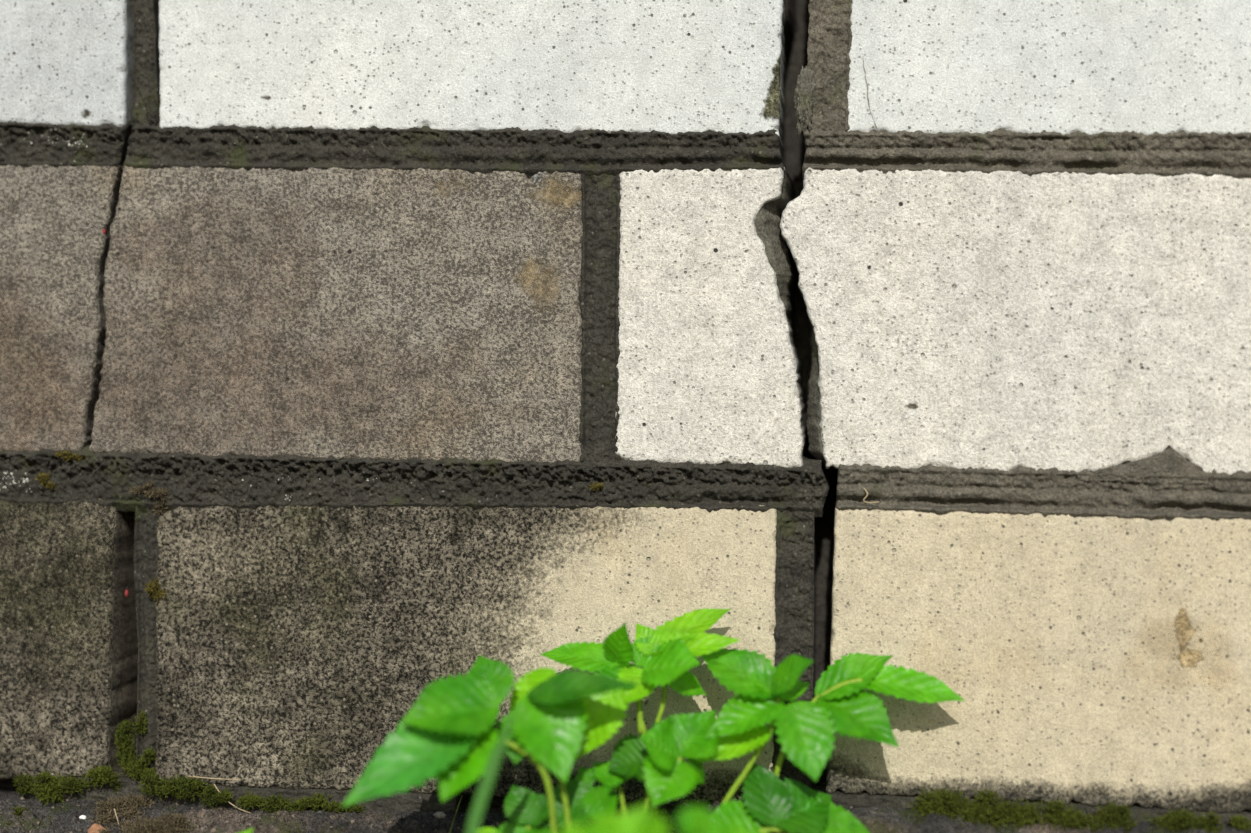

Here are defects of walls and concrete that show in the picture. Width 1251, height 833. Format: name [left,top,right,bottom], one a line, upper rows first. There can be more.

crack [754,0,838,703]
damp [0,499,116,780]
damp [155,505,624,797]
damp [593,776,644,802]
damp [666,772,745,803]